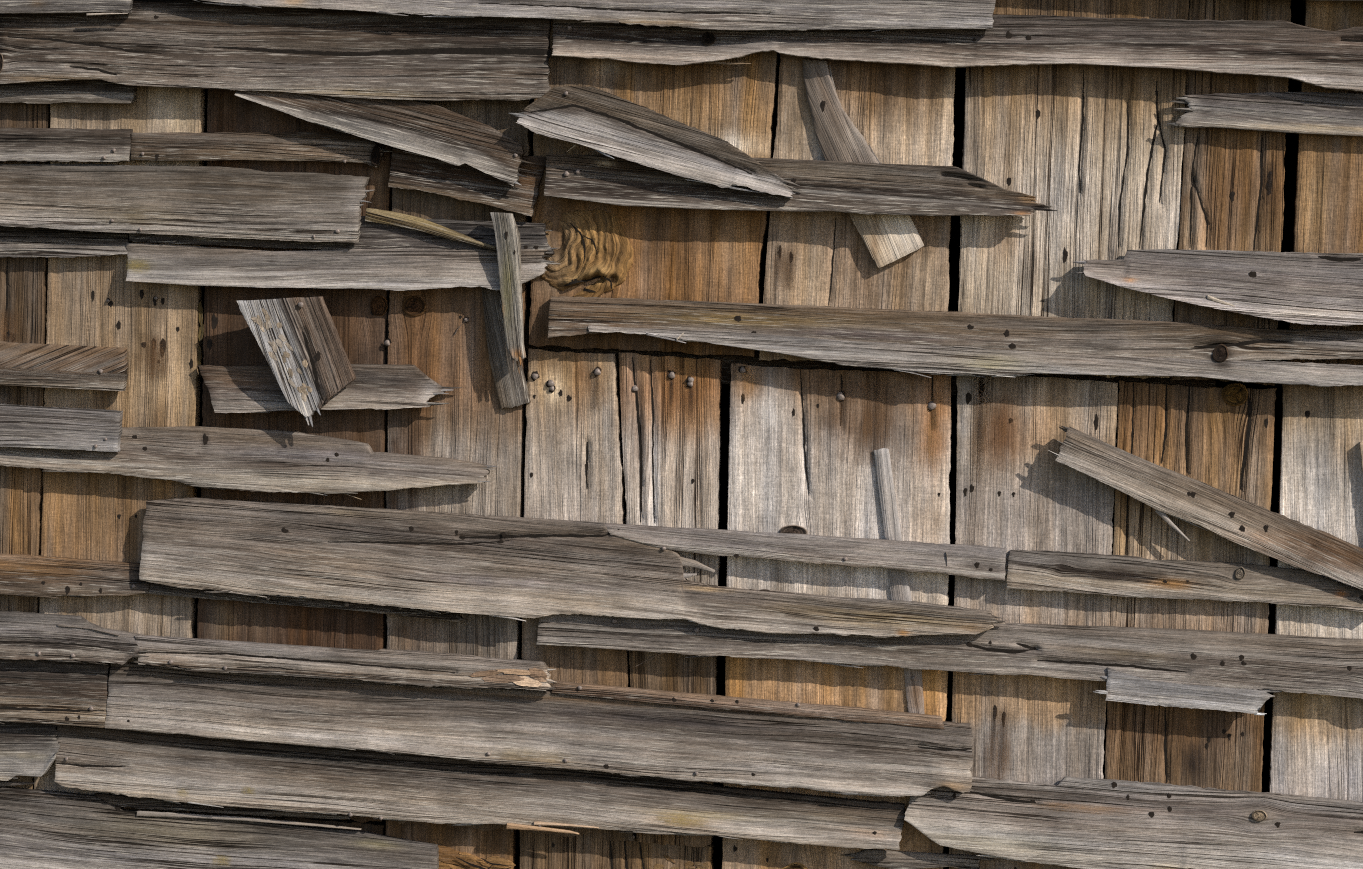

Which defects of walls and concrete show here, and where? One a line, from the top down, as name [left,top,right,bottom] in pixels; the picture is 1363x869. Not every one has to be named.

crack [1077,71,1085,193]
crack [1118,81,1208,248]